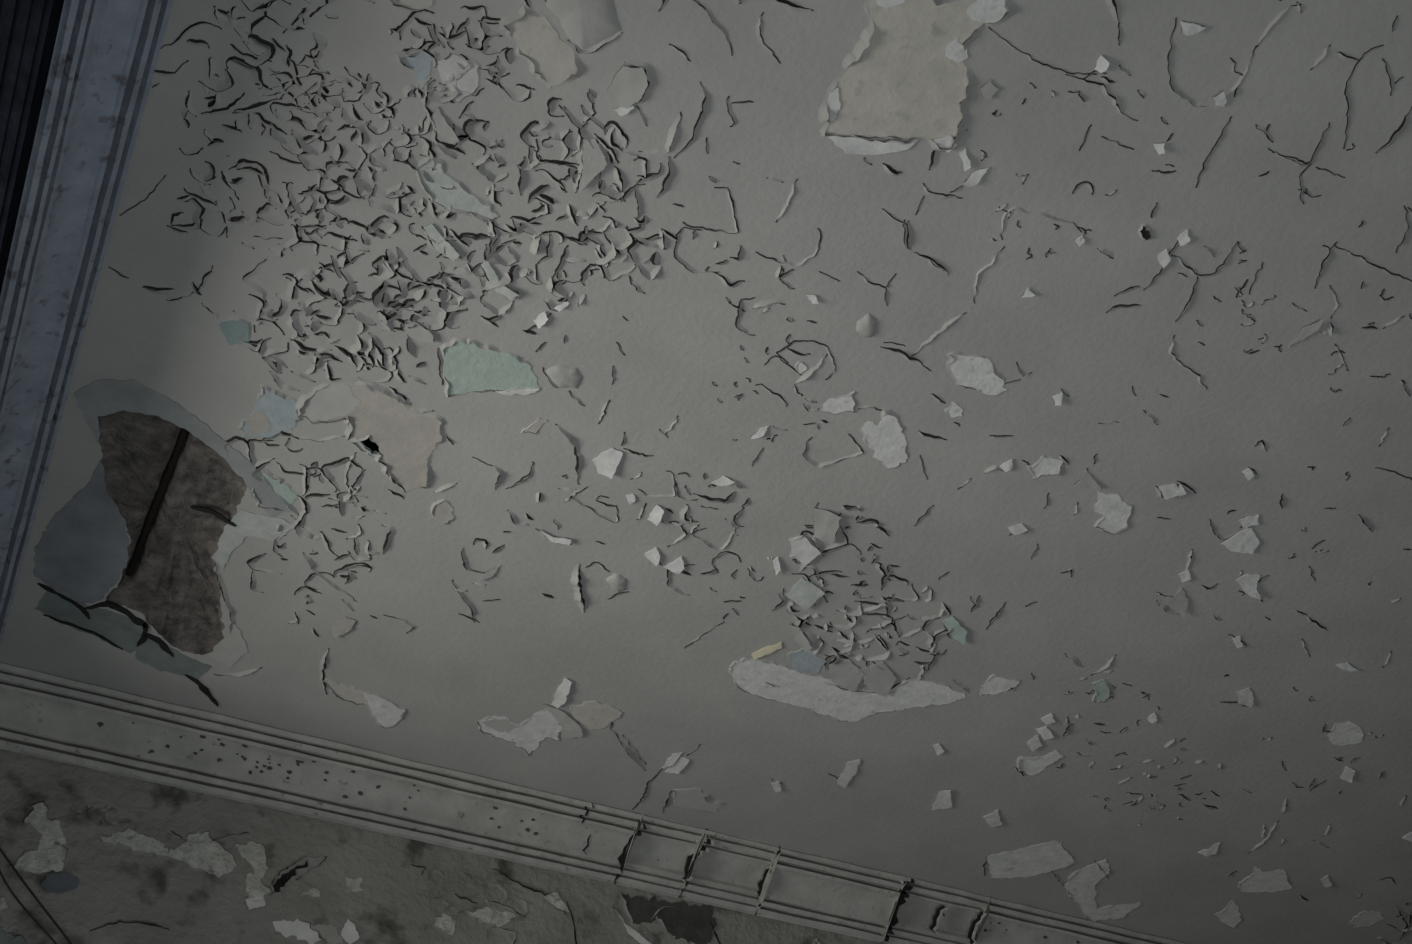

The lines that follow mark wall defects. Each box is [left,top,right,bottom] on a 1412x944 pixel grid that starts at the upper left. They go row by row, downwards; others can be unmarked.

peeling [817,0,1018,187]
peeling [405,155,569,300]
peeling [714,265,819,324]
spalling [33,299,572,707]
peeling [771,502,848,611]
peeling [983,454,1134,536]
peeling [1209,514,1259,554]
peeling [728,594,1022,723]
peeling [476,678,726,813]
peeling [8,801,328,910]
peeling [272,918,360,944]
peeling [983,840,1143,921]